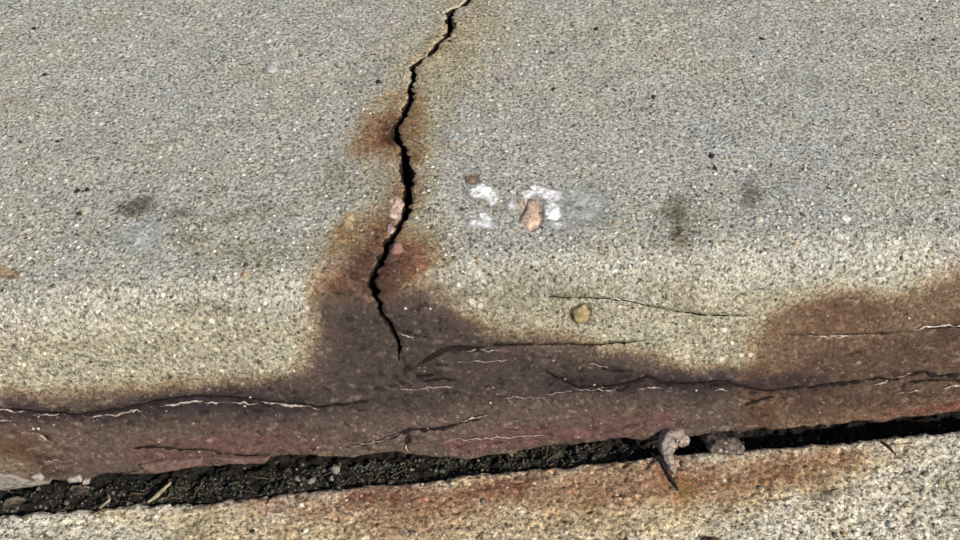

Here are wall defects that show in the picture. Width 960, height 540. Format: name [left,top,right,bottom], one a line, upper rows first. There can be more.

crack [367,0,960,407]
crack [0,396,371,462]
crack [346,415,543,452]
rust [0,275,960,481]